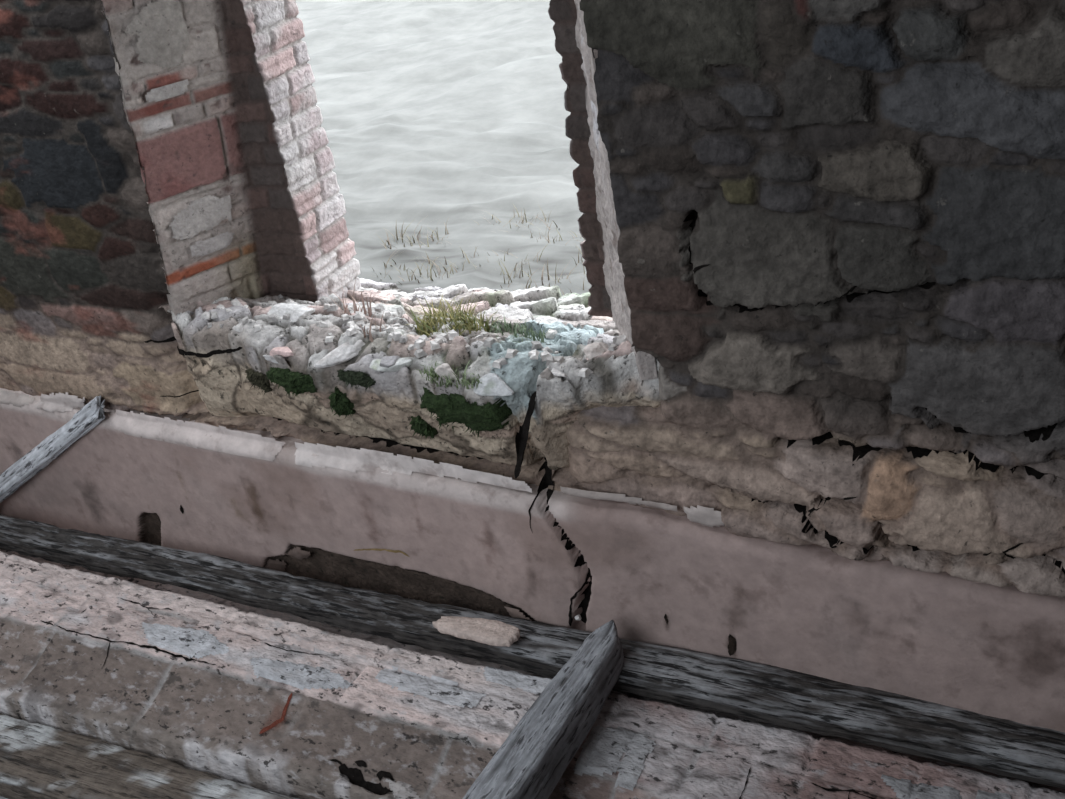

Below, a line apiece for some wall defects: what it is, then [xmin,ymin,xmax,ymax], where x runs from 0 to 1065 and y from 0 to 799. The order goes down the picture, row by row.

crack [514,368,592,626]
flaking render [264,545,536,621]
crack [26,615,216,668]
crack [252,639,336,662]
crack [812,783,892,799]